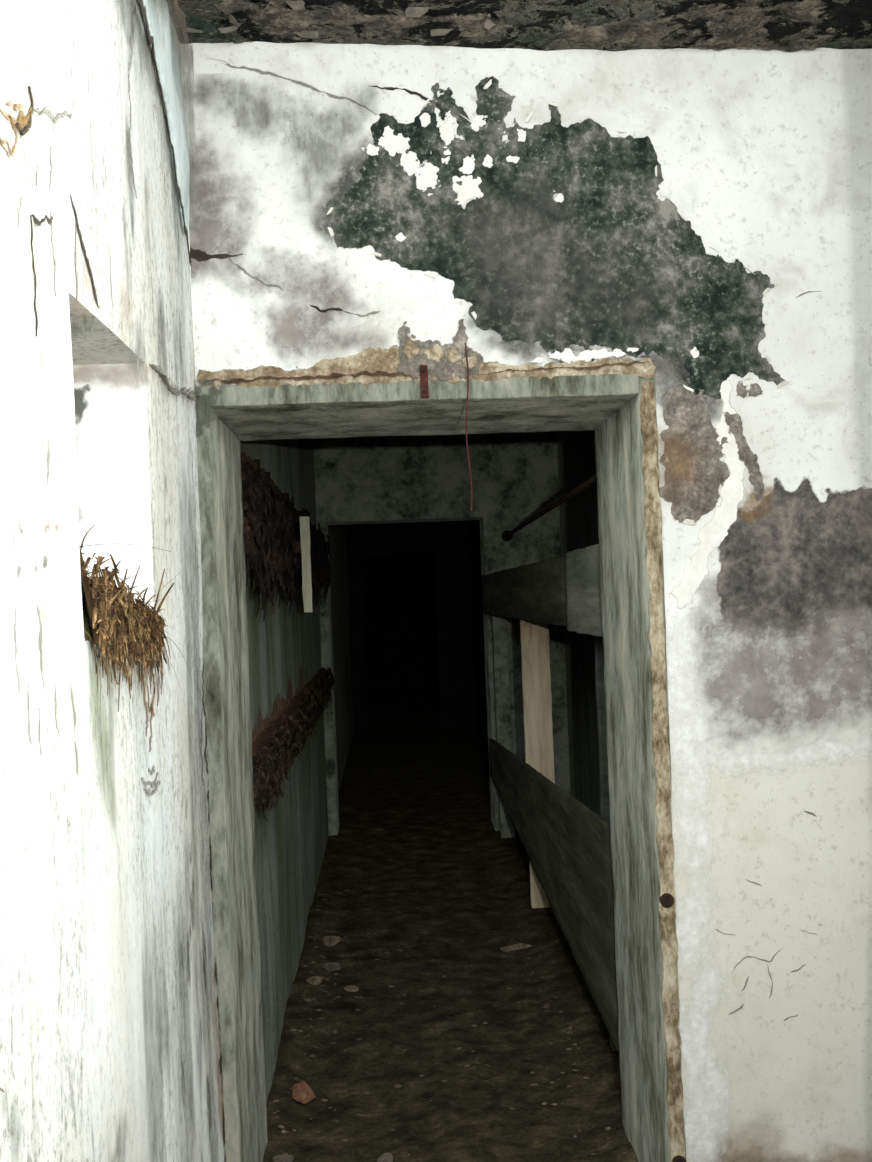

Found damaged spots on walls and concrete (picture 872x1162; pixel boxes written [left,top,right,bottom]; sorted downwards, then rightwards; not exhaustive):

damp [124,127,134,234]
crack [122,0,284,291]
damp [178,146,243,272]
damp [226,88,270,126]
damp [296,116,352,174]
crack [210,58,460,119]
damp [272,276,357,354]
crack [310,305,380,317]
peeling [196,76,789,609]
damp [666,478,872,1162]